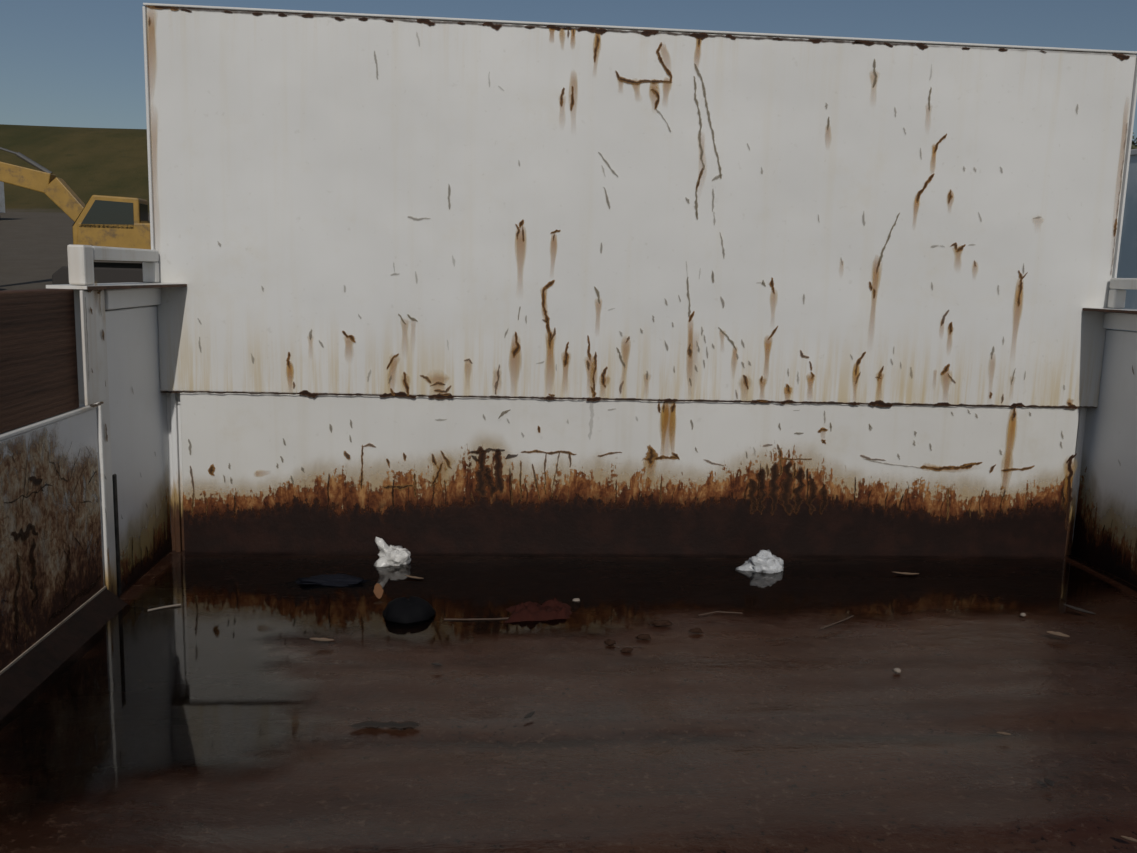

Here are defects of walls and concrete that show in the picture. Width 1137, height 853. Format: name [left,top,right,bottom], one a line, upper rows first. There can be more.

rust [560,86,574,111]
rust [915,133,947,208]
rust [869,260,880,298]
rust [541,280,556,363]
rust [765,326,778,356]
rust [380,354,454,399]
rust [587,335,608,401]
rust [853,352,866,385]
rust [658,398,678,435]
rust [1006,403,1024,456]
rust [108,444,1137,592]